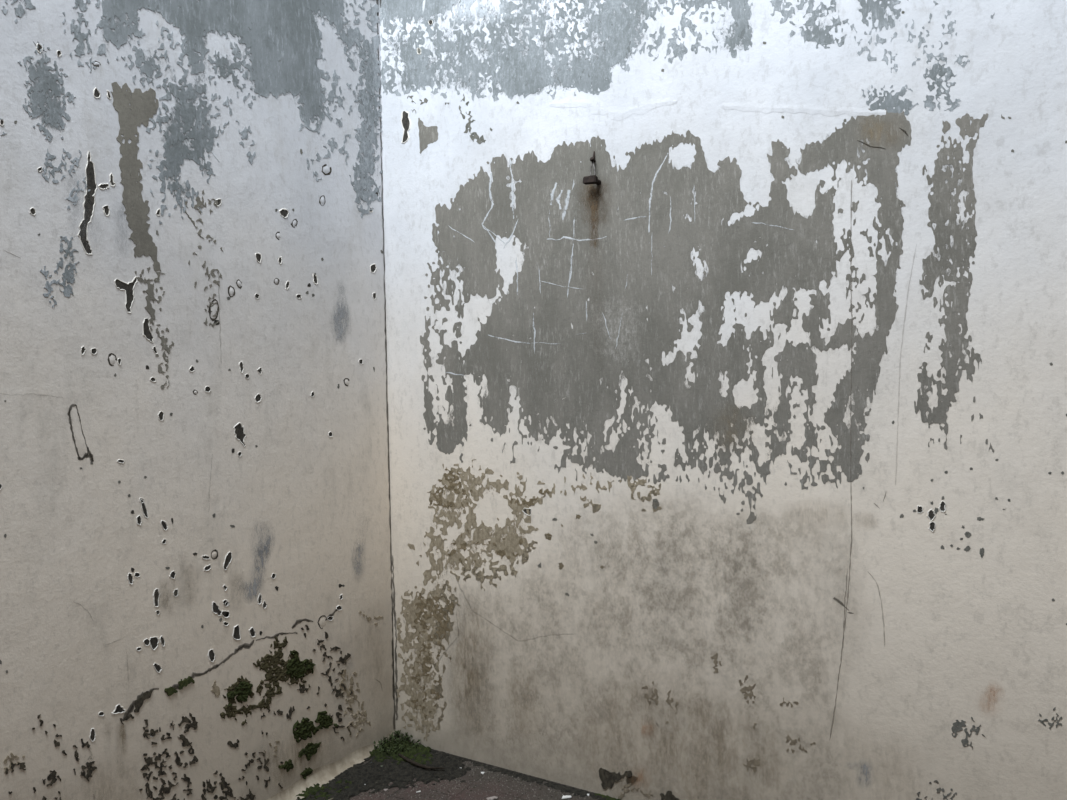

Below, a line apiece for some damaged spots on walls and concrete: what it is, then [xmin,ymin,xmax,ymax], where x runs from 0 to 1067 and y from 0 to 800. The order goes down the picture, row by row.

peeling [0,0,766,389]
peeling [396,0,988,741]
peeling [232,422,258,457]
peeling [98,690,153,725]
peeling [136,636,165,651]
crack [122,609,337,721]
peeling [212,584,262,641]
leakage [297,625,353,741]
leakage [33,770,61,800]
leakage [32,714,97,782]
leakage [139,713,284,800]
leakage [599,768,632,789]